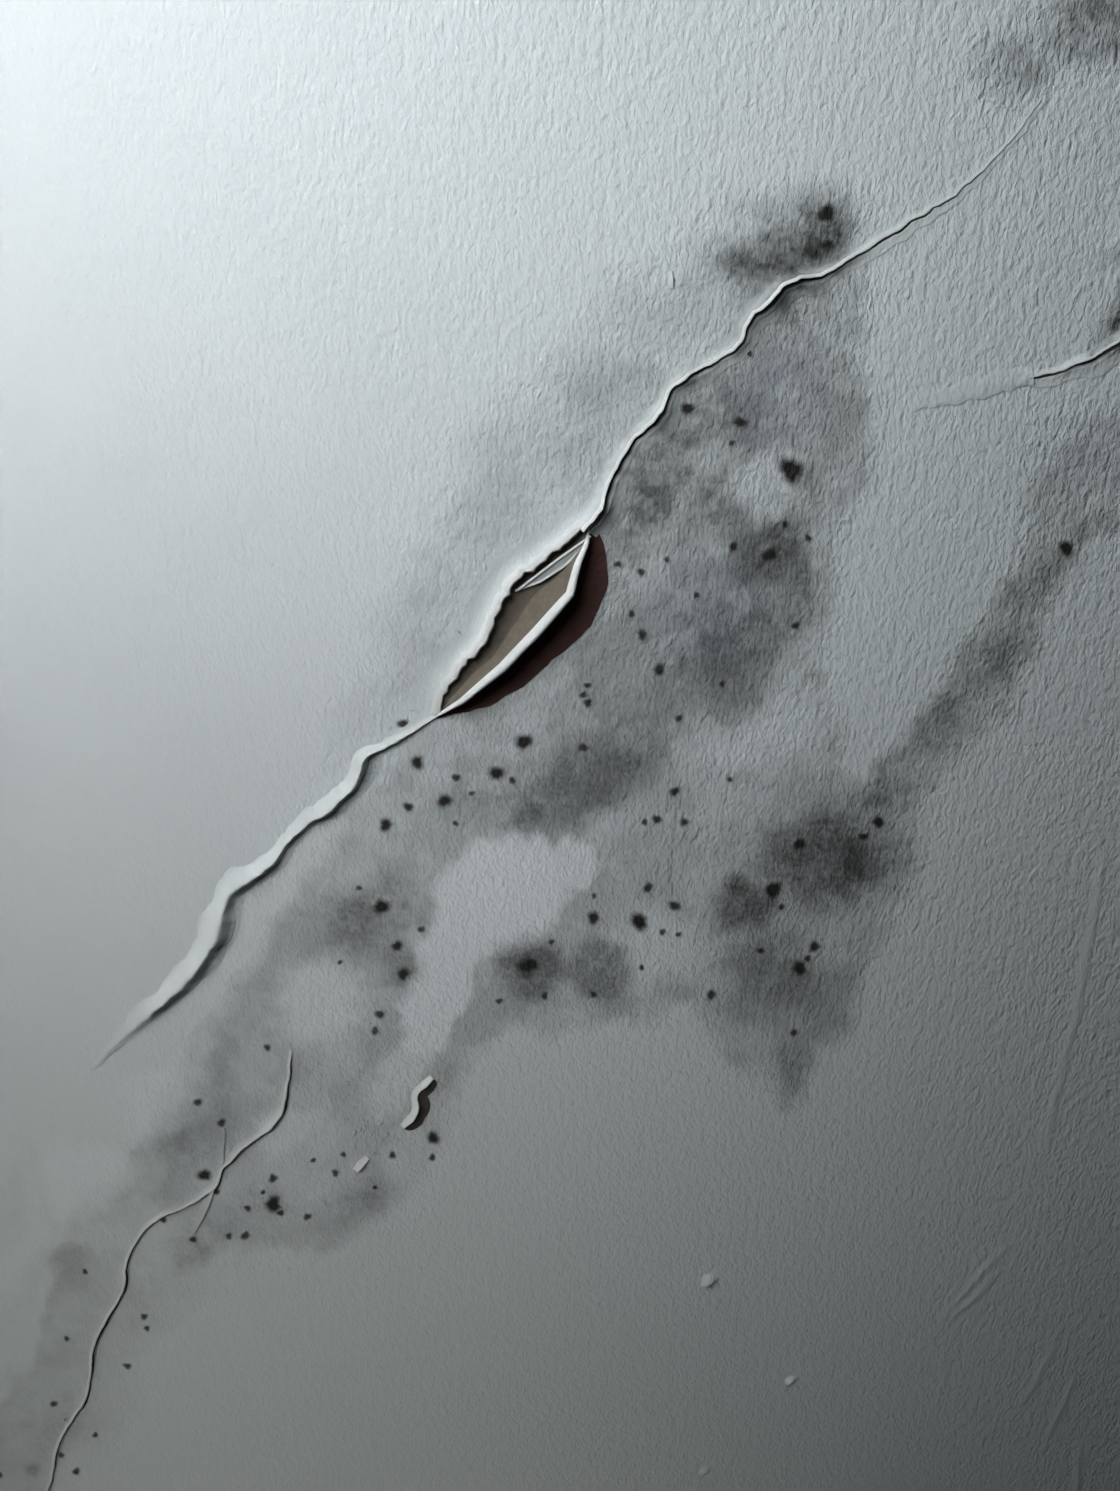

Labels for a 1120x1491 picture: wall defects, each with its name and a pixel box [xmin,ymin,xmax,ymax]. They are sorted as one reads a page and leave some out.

crack [579,98,1045,538]
crack [910,328,1120,411]
leakage [1087,239,1120,351]
peeling [410,503,608,718]
crack [91,712,437,1070]
leakage [49,262,1120,1491]
leakage [0,967,300,1491]
crack [43,1050,292,1491]